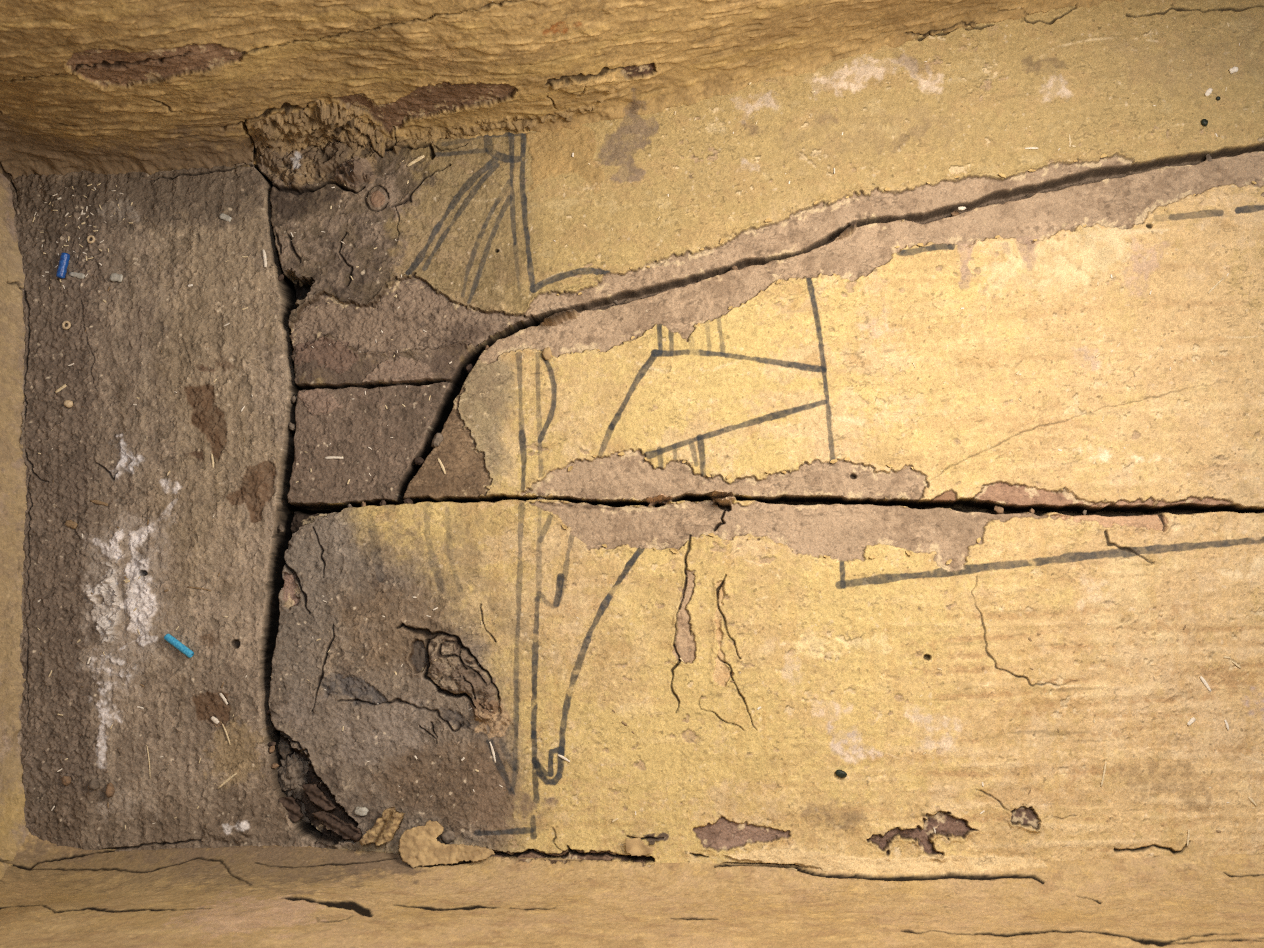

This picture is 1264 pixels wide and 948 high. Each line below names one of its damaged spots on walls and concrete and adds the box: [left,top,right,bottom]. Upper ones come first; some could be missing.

peeling [339,82,517,133]
peeling [289,134,1264,382]
damp [109,433,145,481]
peeling [403,388,493,500]
crack [0,142,1264,886]
peeling [521,448,1234,571]
damp [67,477,188,769]
flaking render [693,811,1048,878]
crack [0,904,211,914]
crack [282,895,557,923]
crack [670,914,720,922]
crack [901,895,1264,948]